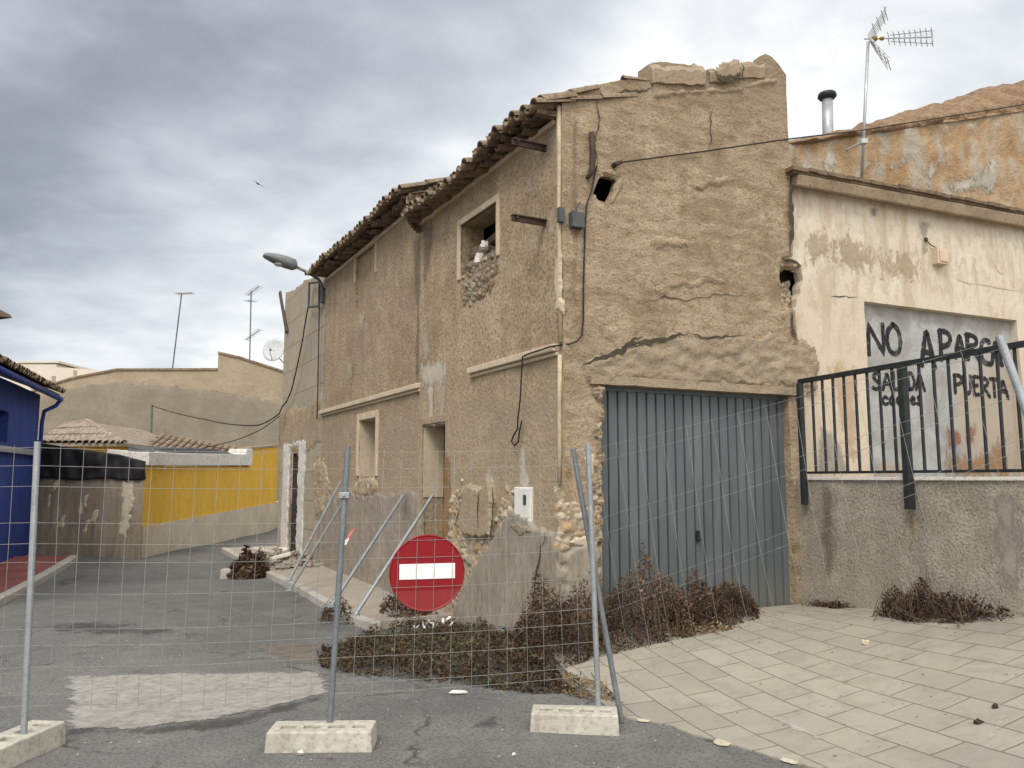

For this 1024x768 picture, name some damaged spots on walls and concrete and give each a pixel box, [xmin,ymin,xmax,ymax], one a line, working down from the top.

hole [602,169,623,205]
crack [645,293,746,303]
spalling [774,227,920,329]
crack [582,332,749,368]
peeling [119,480,135,537]
peeling [447,447,537,612]